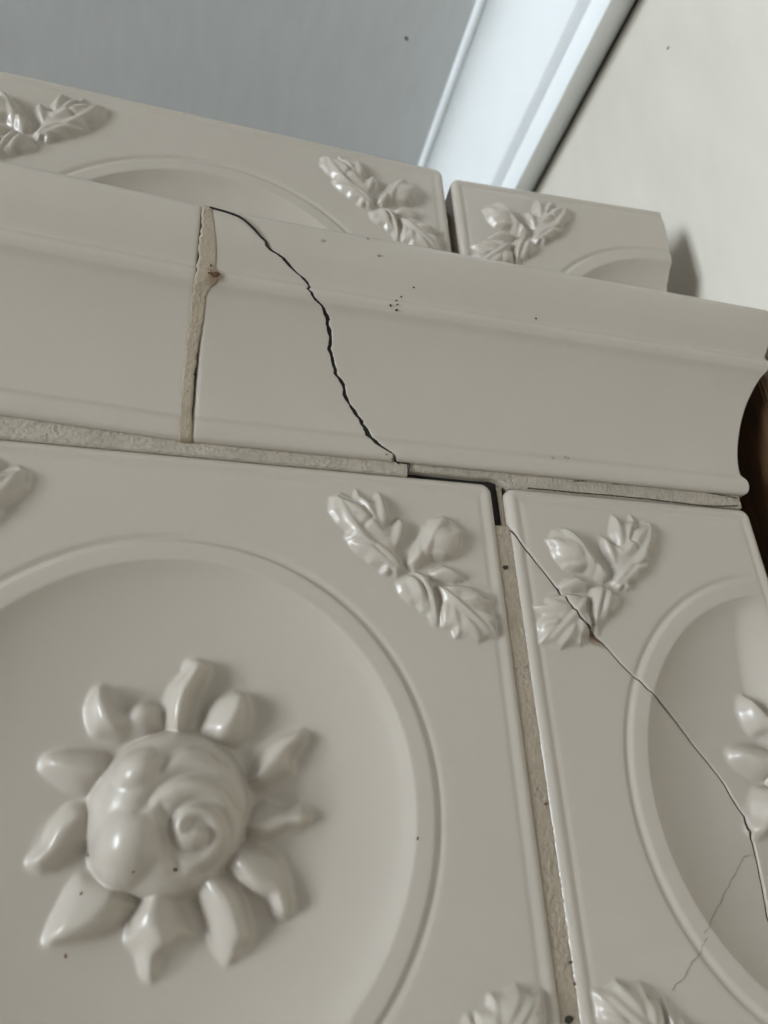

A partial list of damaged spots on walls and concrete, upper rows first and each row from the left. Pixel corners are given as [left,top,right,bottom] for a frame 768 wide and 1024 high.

crack [210,206,410,474]
crack [510,530,768,991]